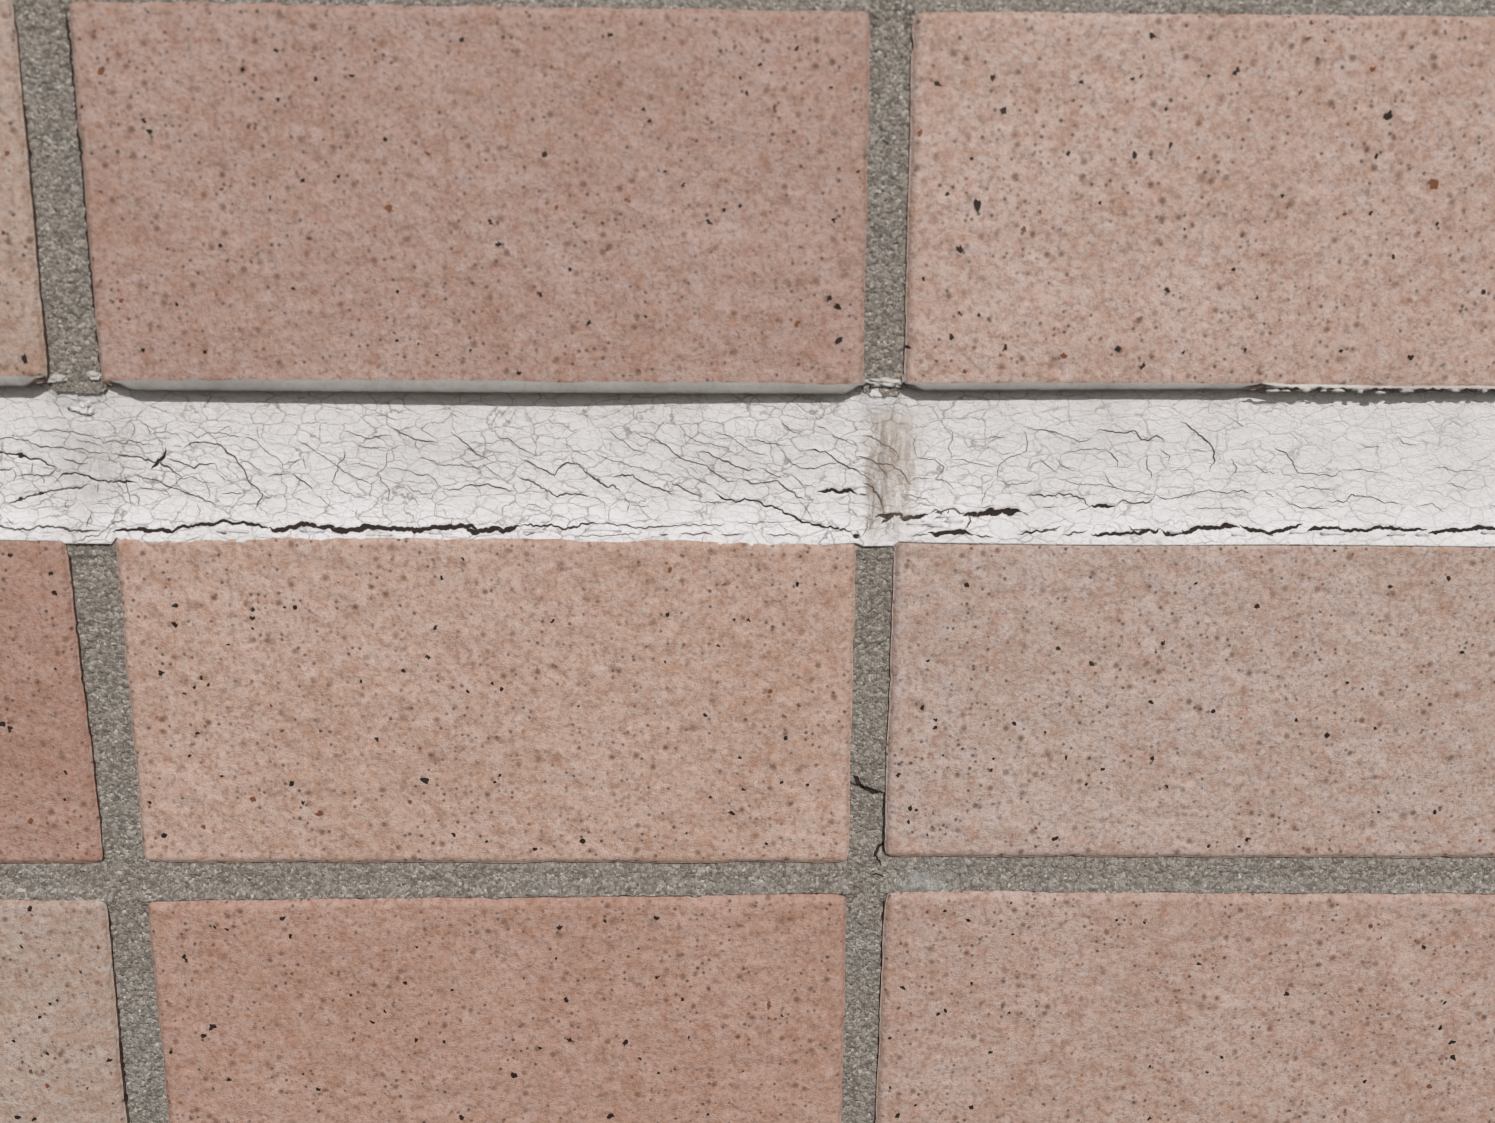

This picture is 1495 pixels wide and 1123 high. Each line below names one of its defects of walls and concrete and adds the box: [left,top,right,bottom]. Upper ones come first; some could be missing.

crack [0,410,1495,541]